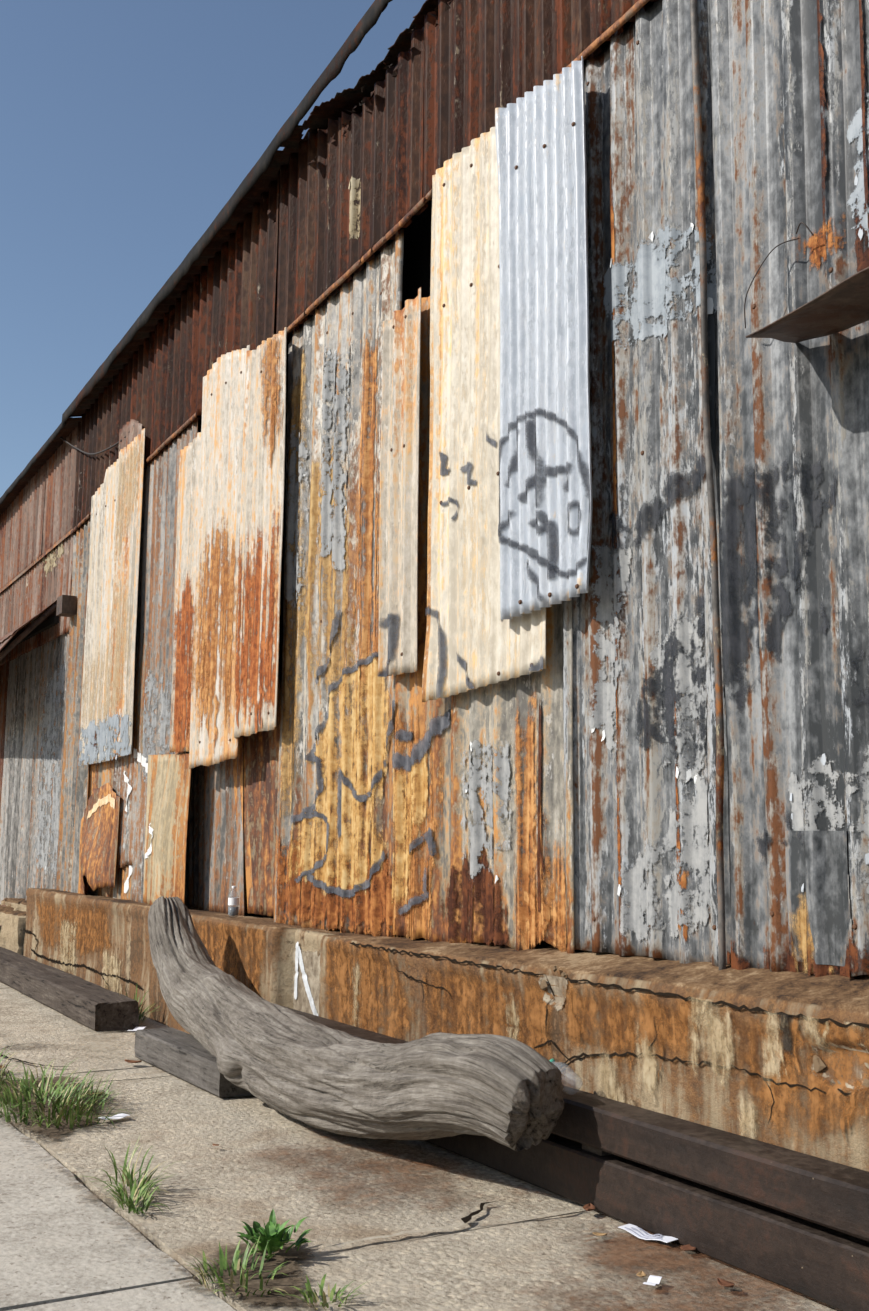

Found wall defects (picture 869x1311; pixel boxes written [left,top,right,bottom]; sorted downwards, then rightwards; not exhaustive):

corrosion [798,0,869,279]
peeling [847,93,869,246]
corrosion [171,337,382,817]
corrosion [193,690,567,1038]
peeling [617,614,711,945]
peeling [785,745,869,900]
crack [23,929,143,990]
crack [0,1042,167,1084]
corrosion [423,968,697,1078]
crack [350,942,869,1123]
corrosion [741,1016,869,1140]
crack [318,1201,581,1249]